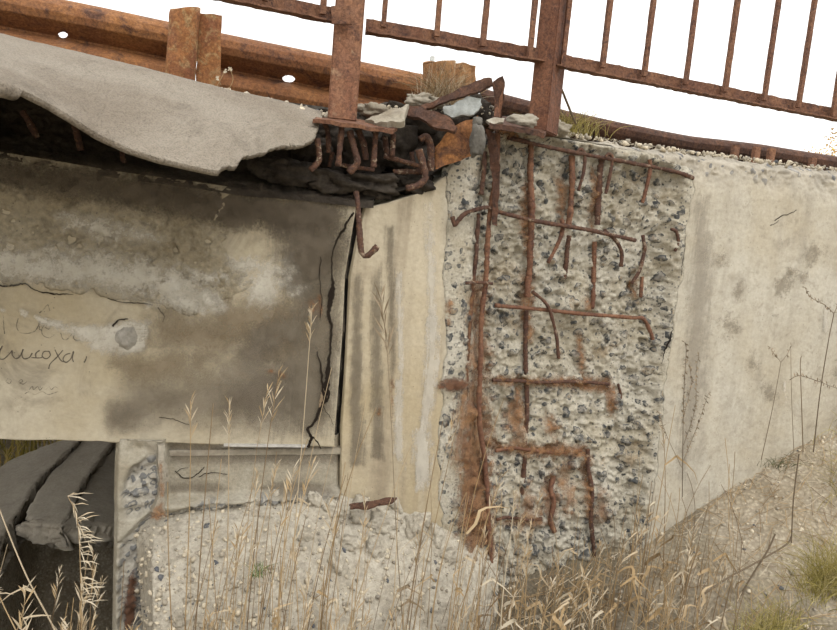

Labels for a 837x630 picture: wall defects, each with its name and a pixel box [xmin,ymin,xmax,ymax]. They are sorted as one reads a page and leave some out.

crack [0,283,74,295]
spalling [15,516,114,545]
crack [108,298,165,327]
water stain [0,160,349,430]
peeling [0,96,387,317]
crack [306,212,354,449]
spalling [308,109,695,587]
rust [437,274,618,562]